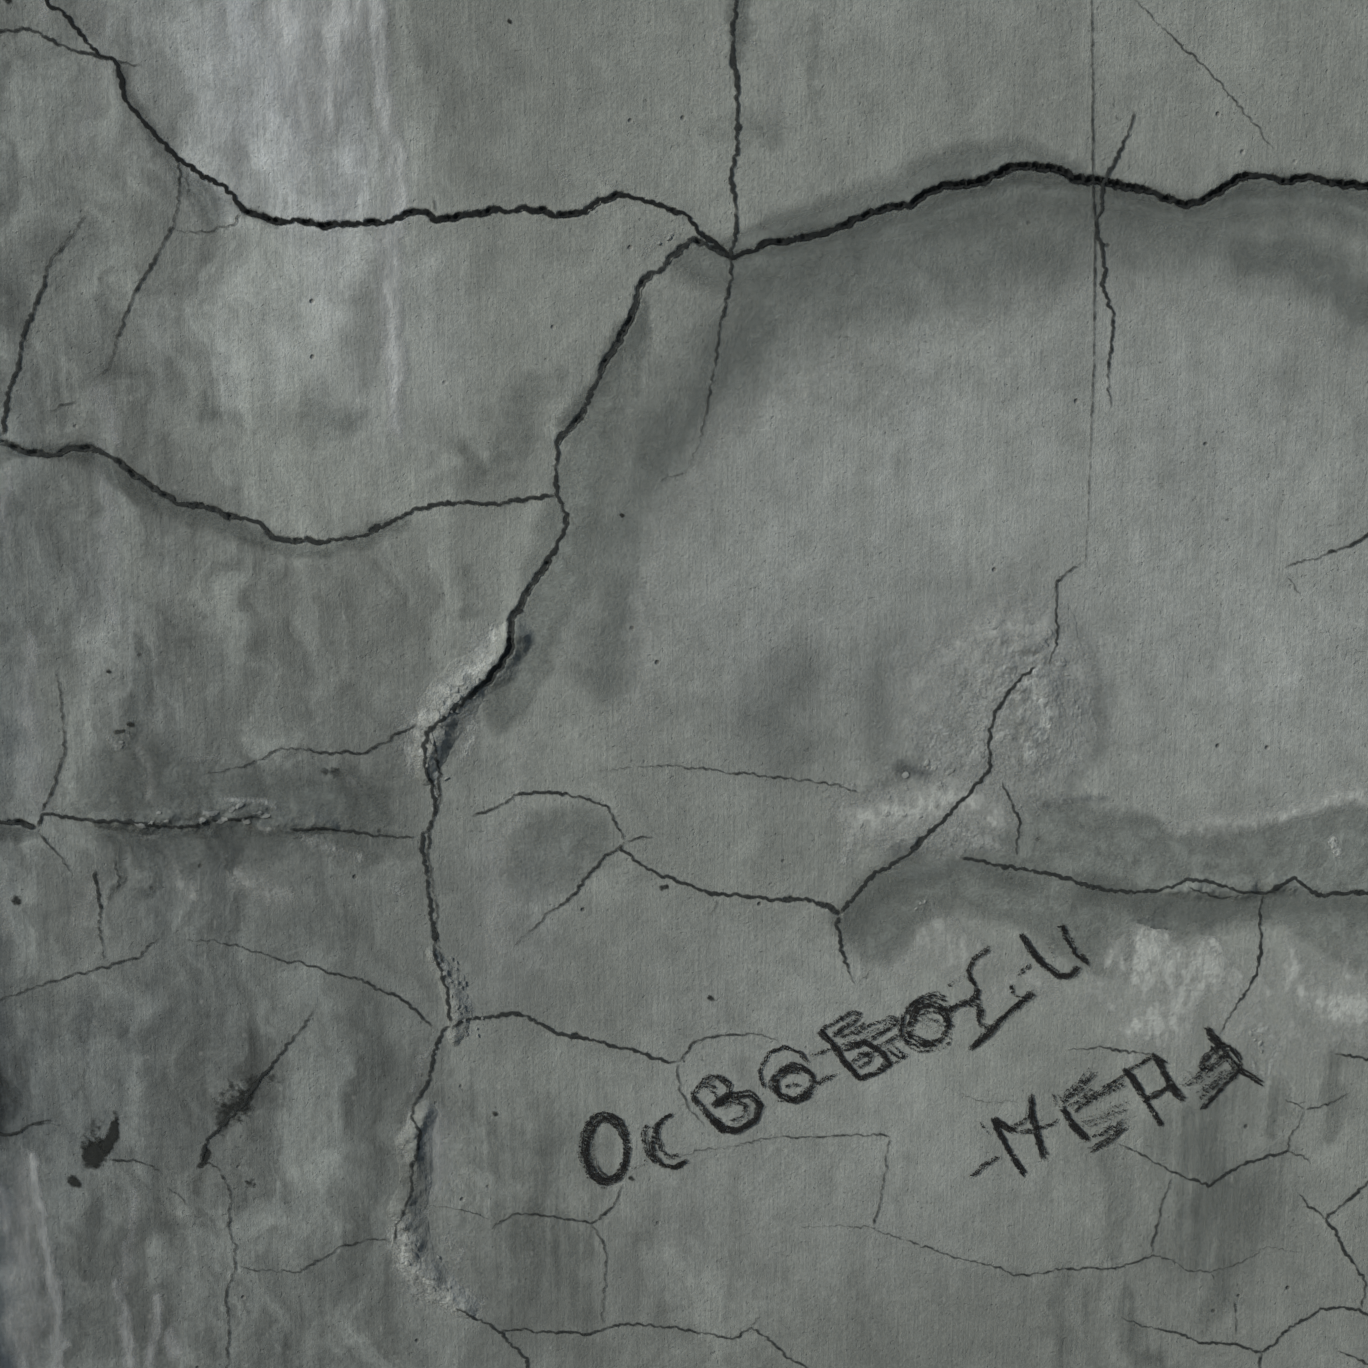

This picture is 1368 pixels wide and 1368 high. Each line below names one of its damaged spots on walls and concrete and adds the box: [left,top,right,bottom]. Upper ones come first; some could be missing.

leakage [4,445,406,556]
leakage [263,0,409,434]
crack [0,0,1368,713]
leakage [485,143,1368,728]
flaking render [198,797,272,832]
flaking render [399,624,515,811]
crack [394,716,674,1239]
crack [475,556,1368,1029]
leakage [842,784,1368,1064]
leakage [26,1153,66,1368]
crack [459,1189,807,1368]
crack [1136,1181,1368,1367]